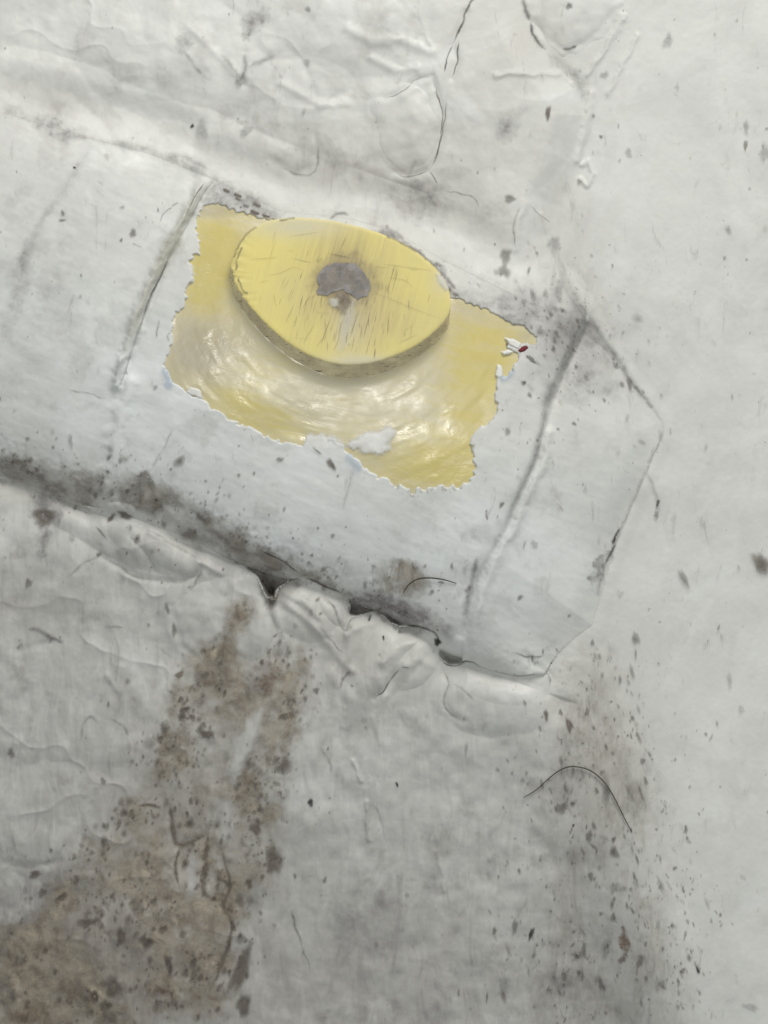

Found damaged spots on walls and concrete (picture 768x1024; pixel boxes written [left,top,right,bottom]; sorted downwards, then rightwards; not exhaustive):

peeling [163,189,537,496]
leakage [0,458,100,523]
leakage [121,472,183,514]
leakage [182,513,289,596]
leakage [350,559,429,629]
leakage [186,604,308,825]
leakage [0,880,128,1024]
leakage [97,801,262,1012]